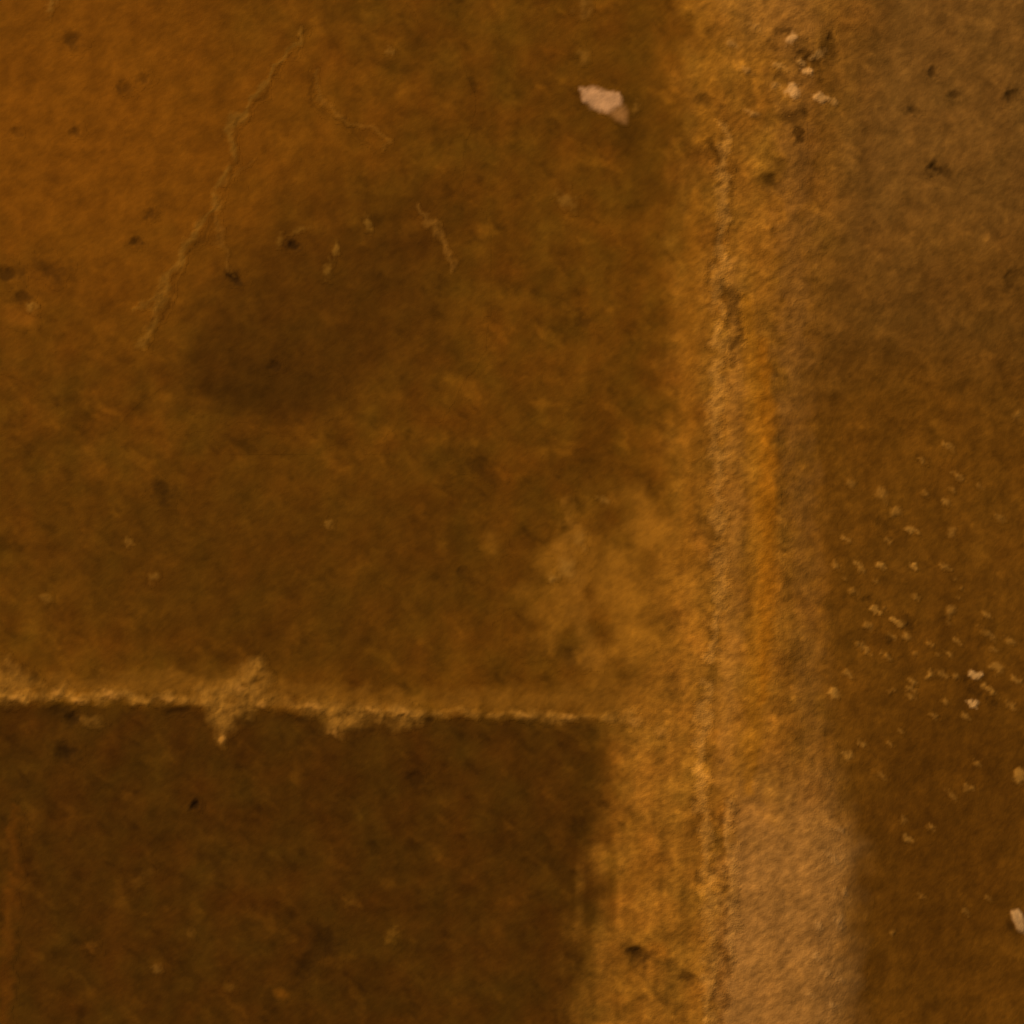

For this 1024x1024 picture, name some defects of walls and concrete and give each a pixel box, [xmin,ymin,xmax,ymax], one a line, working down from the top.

spalling [577,83,643,127]
leakage [0,164,562,687]